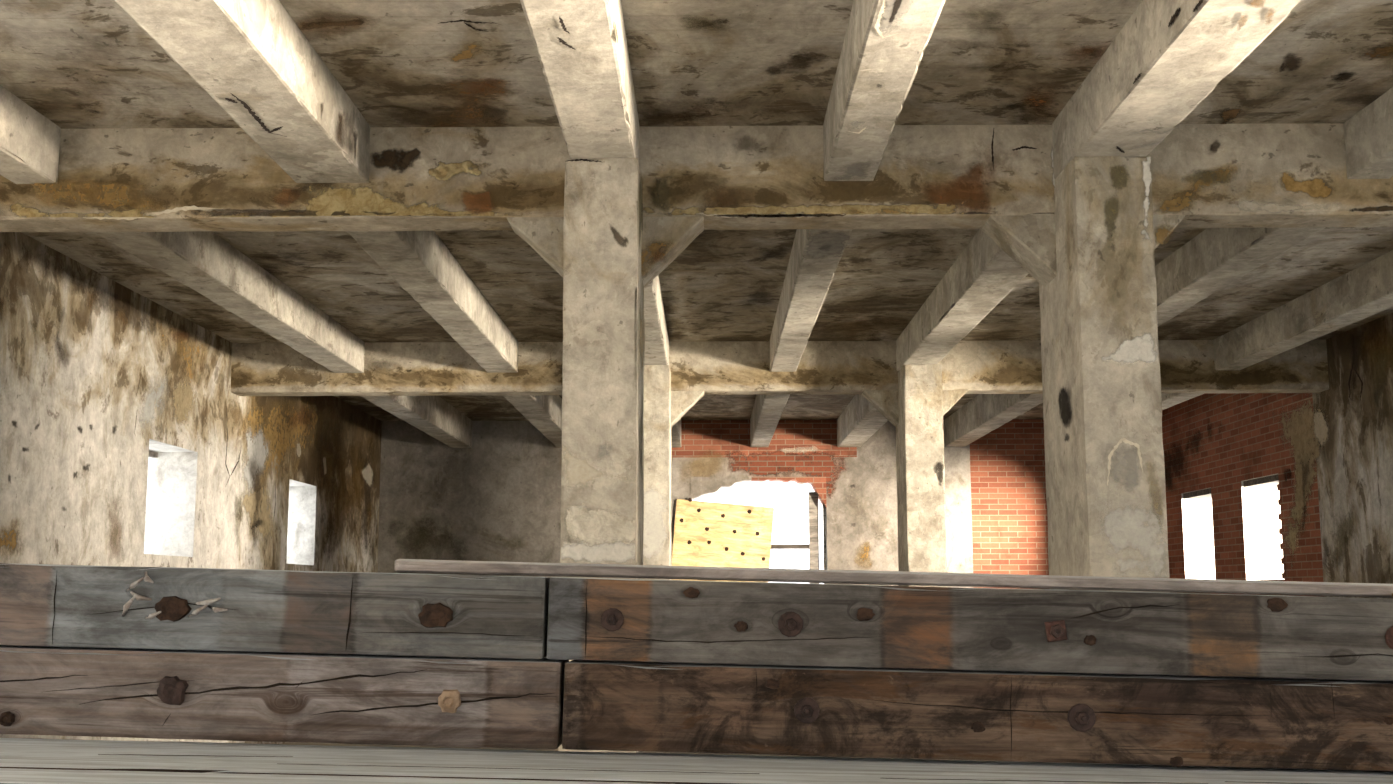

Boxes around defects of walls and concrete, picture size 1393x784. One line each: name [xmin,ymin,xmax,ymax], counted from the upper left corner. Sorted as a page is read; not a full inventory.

spalling [875,0,913,38]
leakage [44,258,205,385]
peeling [1103,334,1155,362]
leakage [237,399,375,554]
peeling [1106,438,1164,570]
leakage [0,521,21,552]
leakage [1324,512,1353,565]